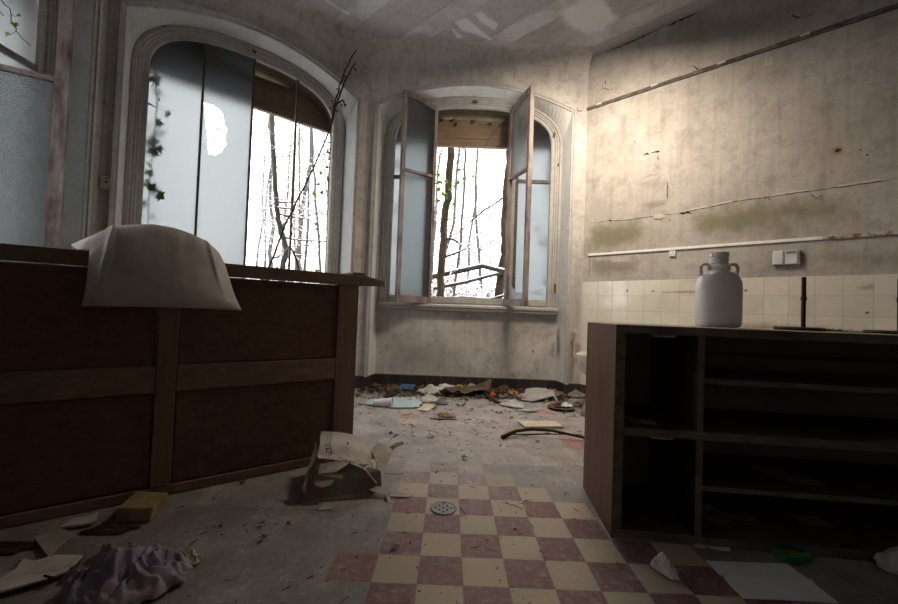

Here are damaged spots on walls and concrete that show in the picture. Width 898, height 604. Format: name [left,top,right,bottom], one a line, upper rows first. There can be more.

crack [607,12,697,52]
crack [595,179,894,223]
leakage [684,180,898,275]
leakage [379,197,669,384]